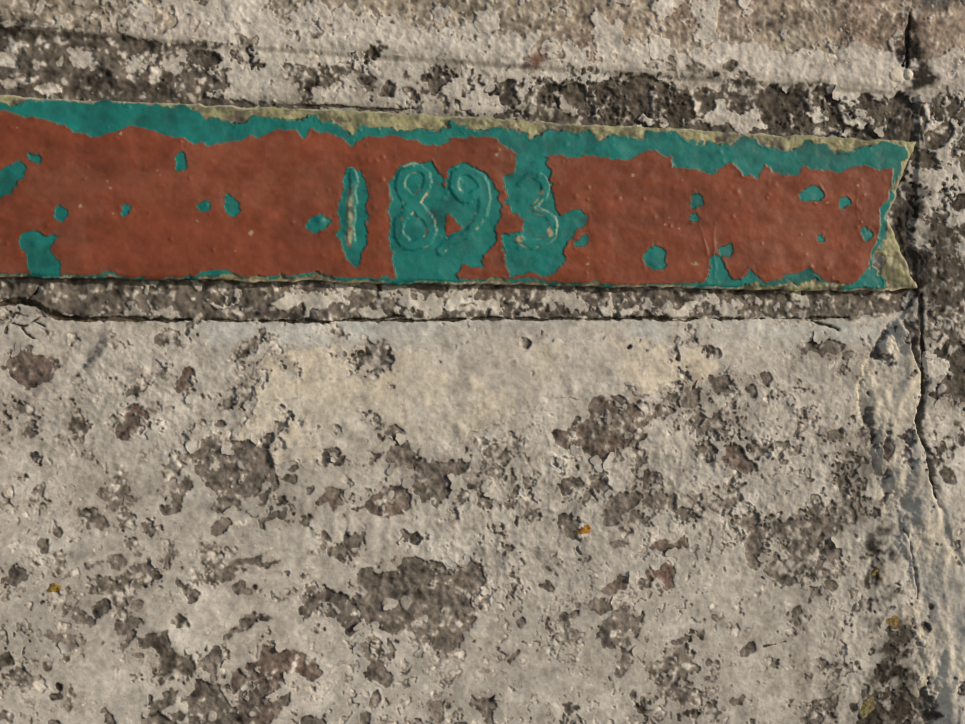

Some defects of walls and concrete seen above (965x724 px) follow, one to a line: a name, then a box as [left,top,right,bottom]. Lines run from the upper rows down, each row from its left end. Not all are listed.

spalling [357,44,458,103]
crack [901,12,911,69]
peeling [388,67,926,282]
peeling [141,420,298,537]
peeling [306,424,504,518]
crack [0,287,849,339]
peeling [551,365,772,527]
crack [894,293,937,499]
spalling [921,333,965,408]
peeling [84,554,326,724]
peeling [298,525,486,724]
peeling [542,536,691,656]